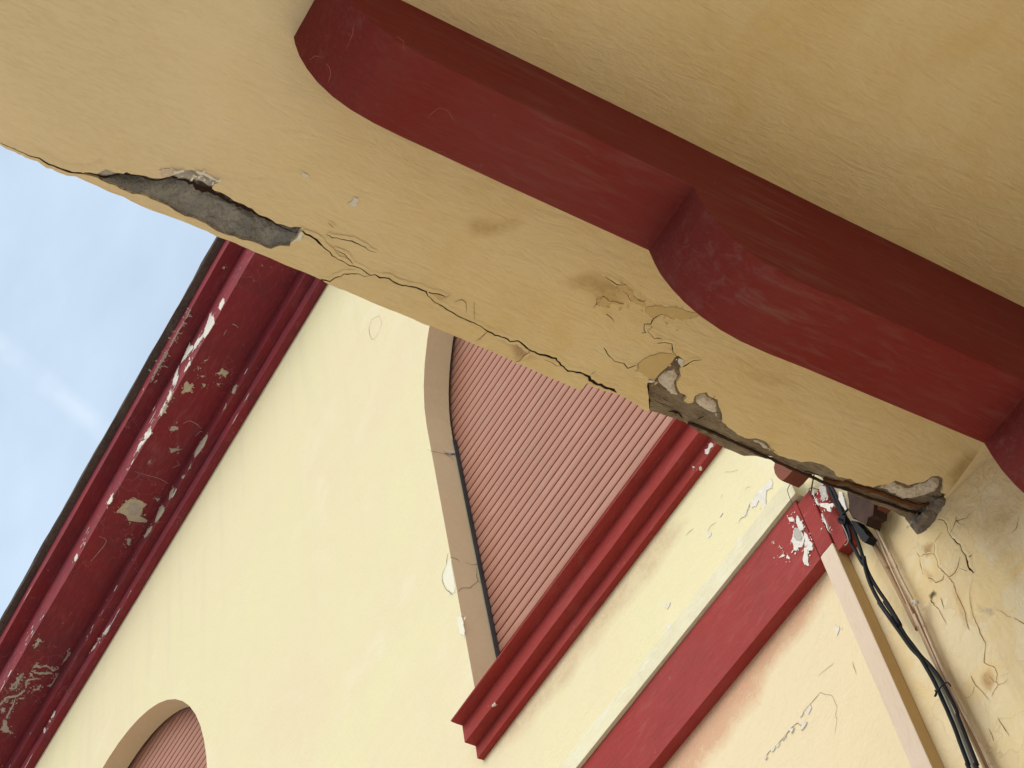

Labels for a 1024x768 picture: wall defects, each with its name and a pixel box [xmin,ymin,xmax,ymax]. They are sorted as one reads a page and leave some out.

crack [0,141,84,177]
spalling [85,166,304,248]
peeling [107,433,208,548]
peeling [127,298,249,470]
crack [302,221,639,394]
spalling [638,349,946,534]
peeling [0,648,71,734]
crack [917,515,1024,741]